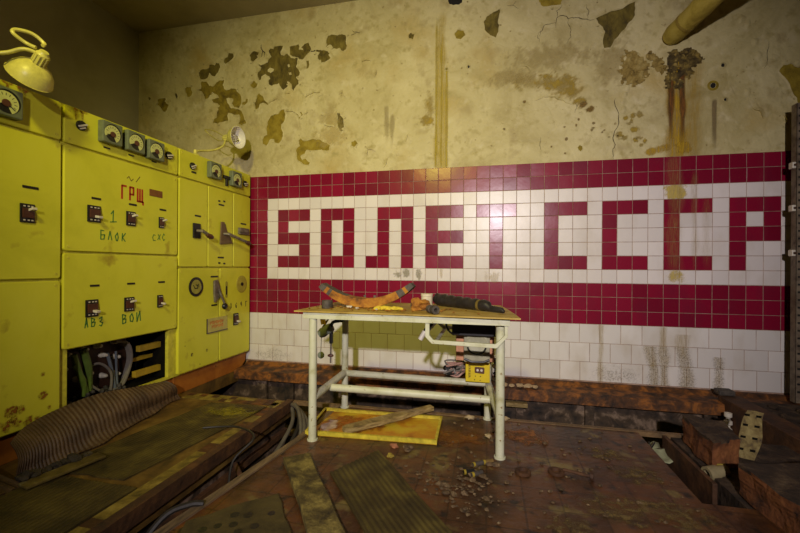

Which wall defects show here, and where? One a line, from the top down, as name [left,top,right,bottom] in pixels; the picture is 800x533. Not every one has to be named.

peeling [482,8,502,38]
crack [537,6,594,39]
peeling [594,1,638,51]
peeling [148,33,349,147]
corrosion [666,62,687,157]
peeling [777,61,800,103]
peeling [295,138,331,166]